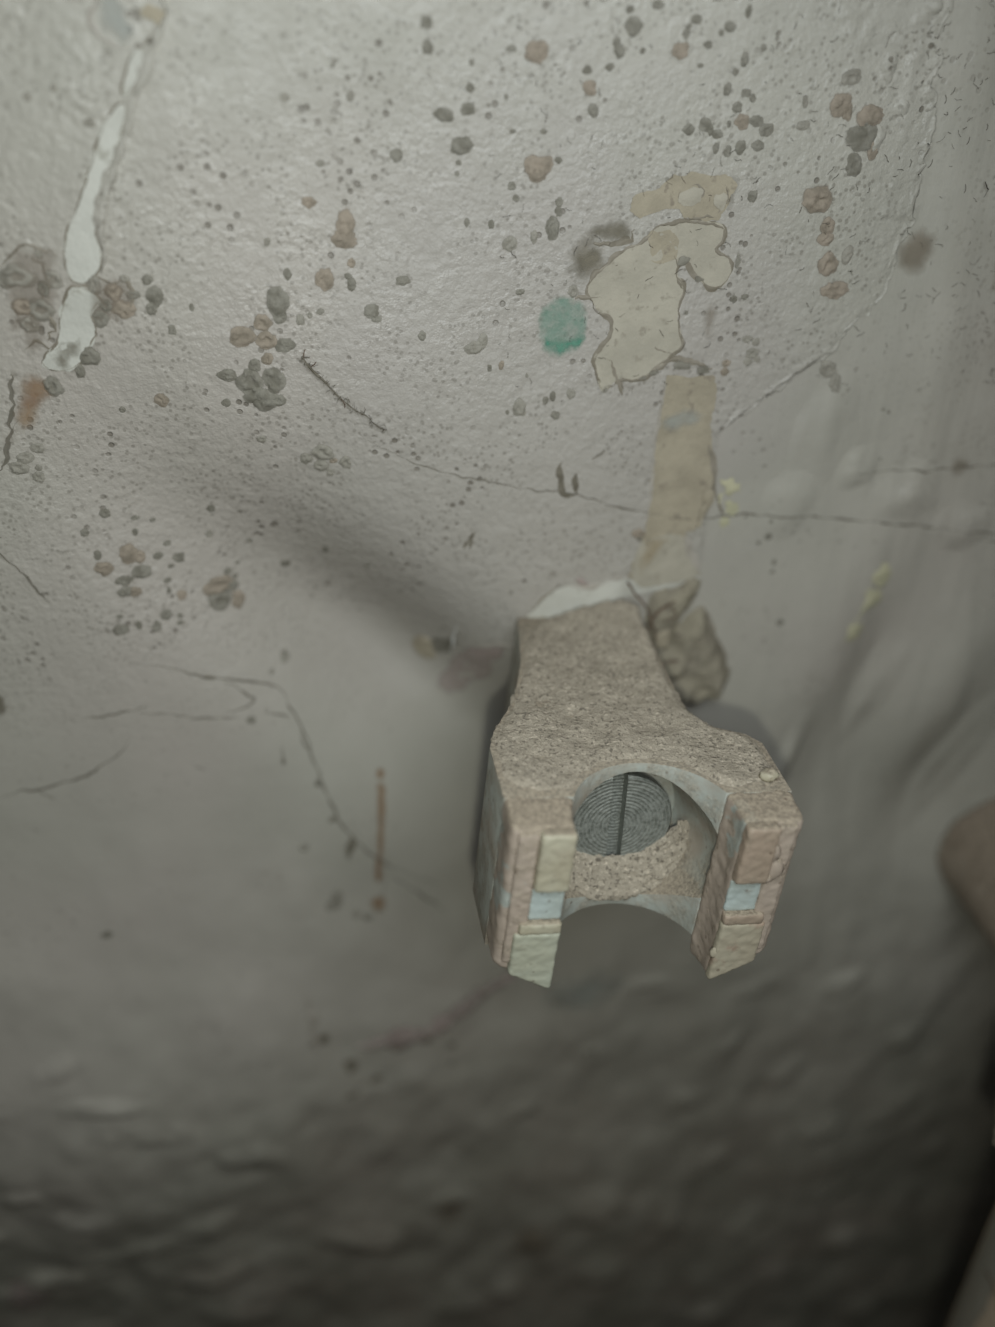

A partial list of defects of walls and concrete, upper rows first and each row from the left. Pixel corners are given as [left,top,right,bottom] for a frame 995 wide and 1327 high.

crack [0,0,168,471]
peeling [575,171,741,395]
spalling [556,463,579,498]
crack [357,432,995,542]
crack [0,537,48,602]
peeling [523,576,699,618]
crack [1,661,442,886]
corrosion [376,769,385,881]